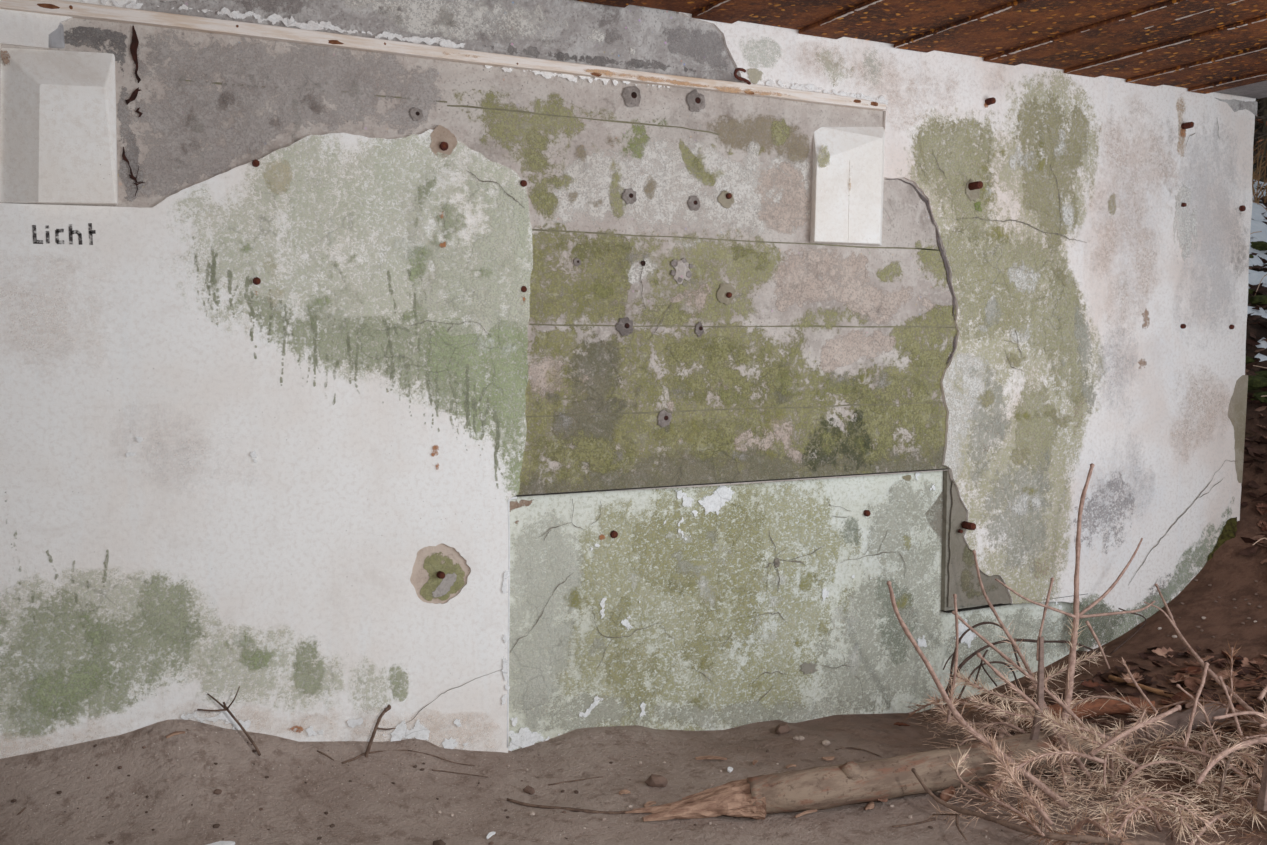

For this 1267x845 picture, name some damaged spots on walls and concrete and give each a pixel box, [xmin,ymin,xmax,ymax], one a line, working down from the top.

crack [125,26,143,117]
crack [122,147,145,196]
damp [195,250,293,386]
damp [298,307,358,404]
damp [376,270,503,486]
spalling [0,0,1010,648]
crack [1129,460,1236,584]